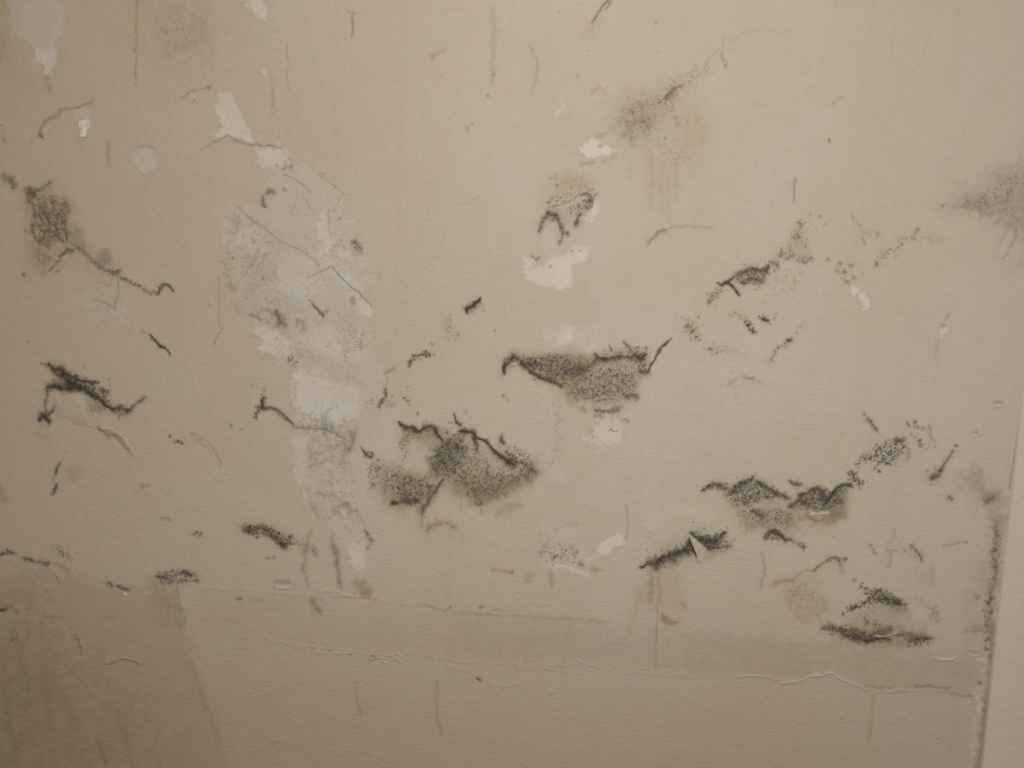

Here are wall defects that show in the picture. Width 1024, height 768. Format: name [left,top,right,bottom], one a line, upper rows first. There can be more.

peeling [5,0,69,95]
water stain [0,170,176,311]
water stain [27,339,149,448]
peeling [208,89,408,584]
water stain [228,294,546,551]
peeling [515,225,595,292]
peeling [578,138,615,160]
peeling [580,414,630,454]
water stain [535,60,722,247]
water stain [498,212,943,420]
water stain [926,141,1024,273]
water stain [0,410,1010,768]